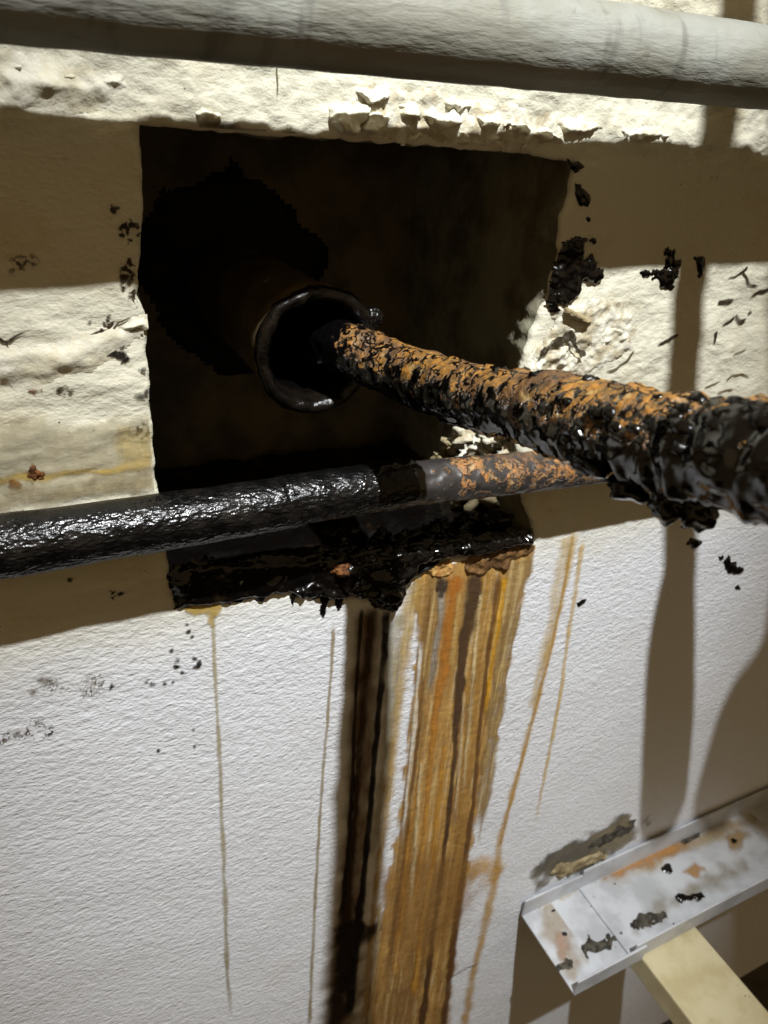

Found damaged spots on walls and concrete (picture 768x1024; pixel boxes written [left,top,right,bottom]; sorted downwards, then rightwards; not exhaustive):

peeling [195,107,248,131]
spalling [328,81,603,153]
spalling [620,124,669,143]
spalling [523,296,637,375]
leakage [146,604,222,687]
leakage [326,611,404,1024]
rust [362,544,536,1024]
leakage [462,539,583,1023]